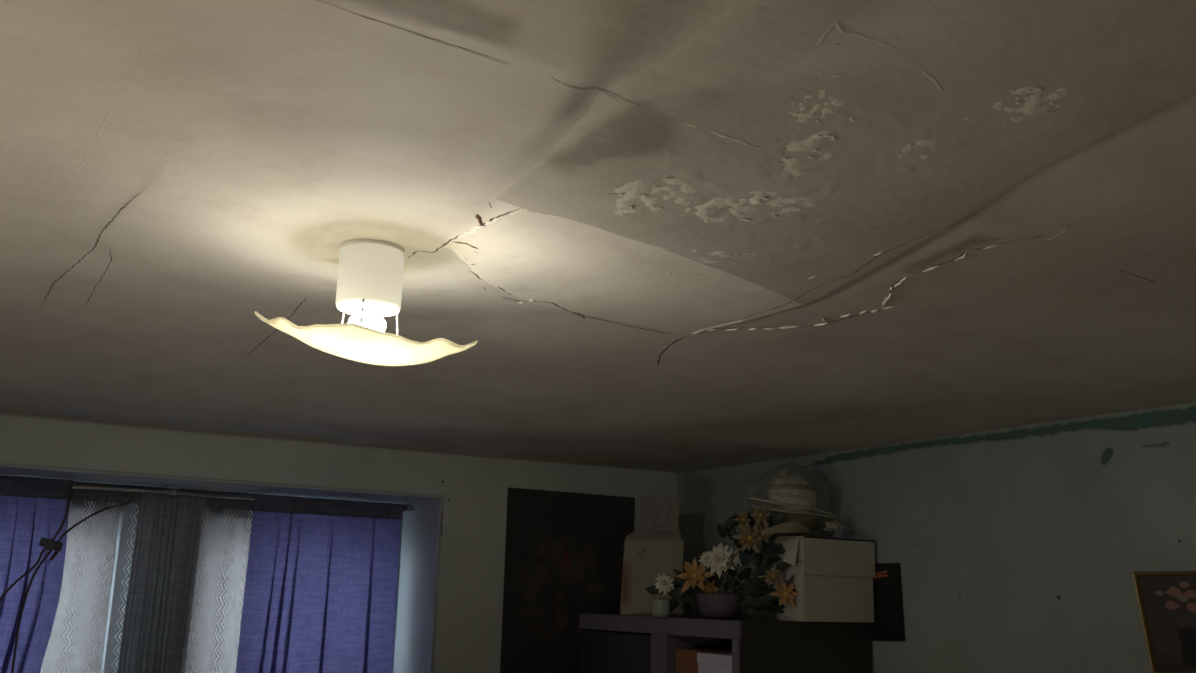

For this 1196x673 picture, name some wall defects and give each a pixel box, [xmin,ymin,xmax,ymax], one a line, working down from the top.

crack [312,0,508,66]
peeling [776,78,854,178]
peeling [992,86,1069,124]
crack [41,191,143,306]
peeling [609,177,815,223]
crack [408,208,1099,366]